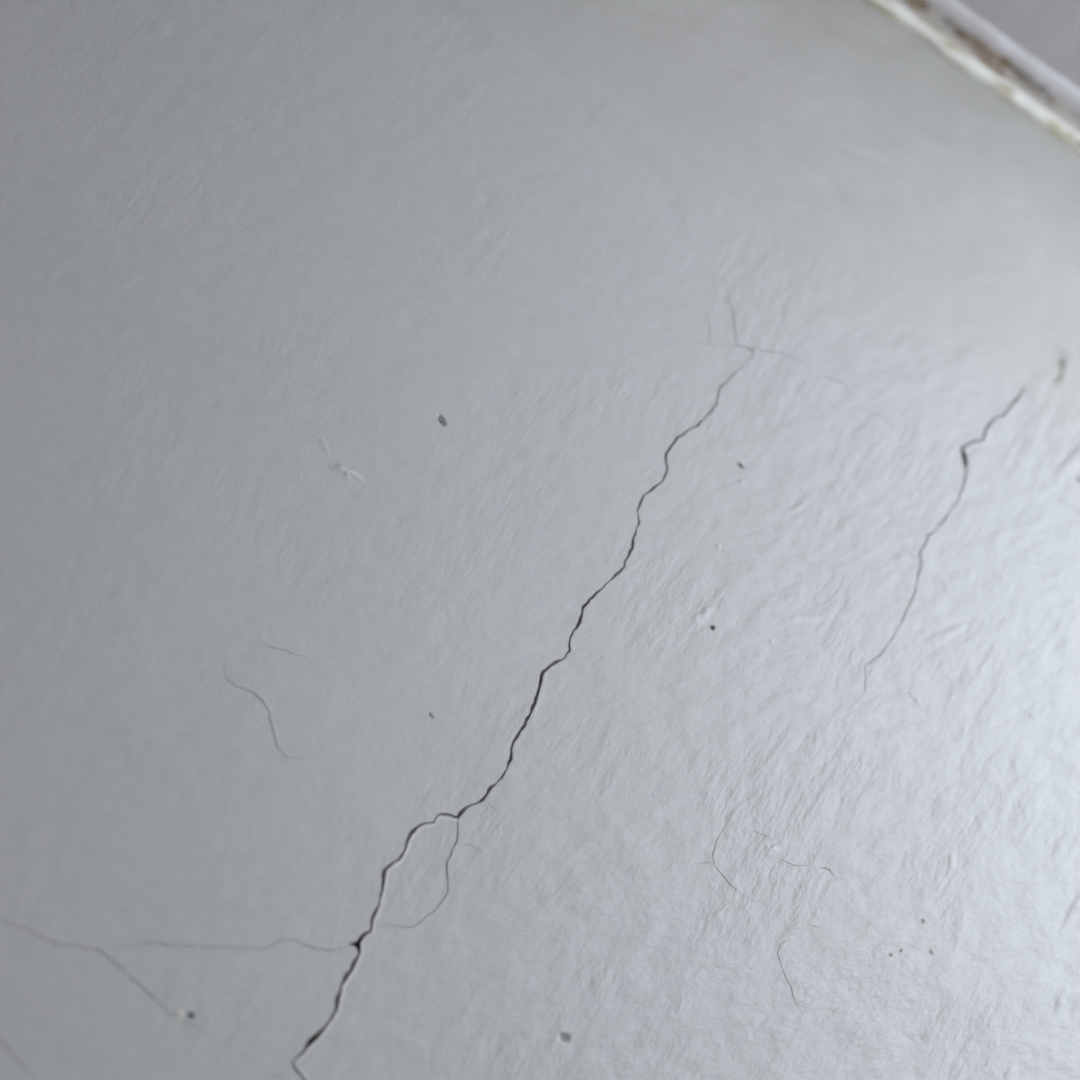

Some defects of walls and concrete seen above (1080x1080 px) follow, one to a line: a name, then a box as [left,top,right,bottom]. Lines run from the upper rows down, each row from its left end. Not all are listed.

corrosion [965,35,1011,76]
crack [0,276,888,1080]
crack [850,386,1028,707]